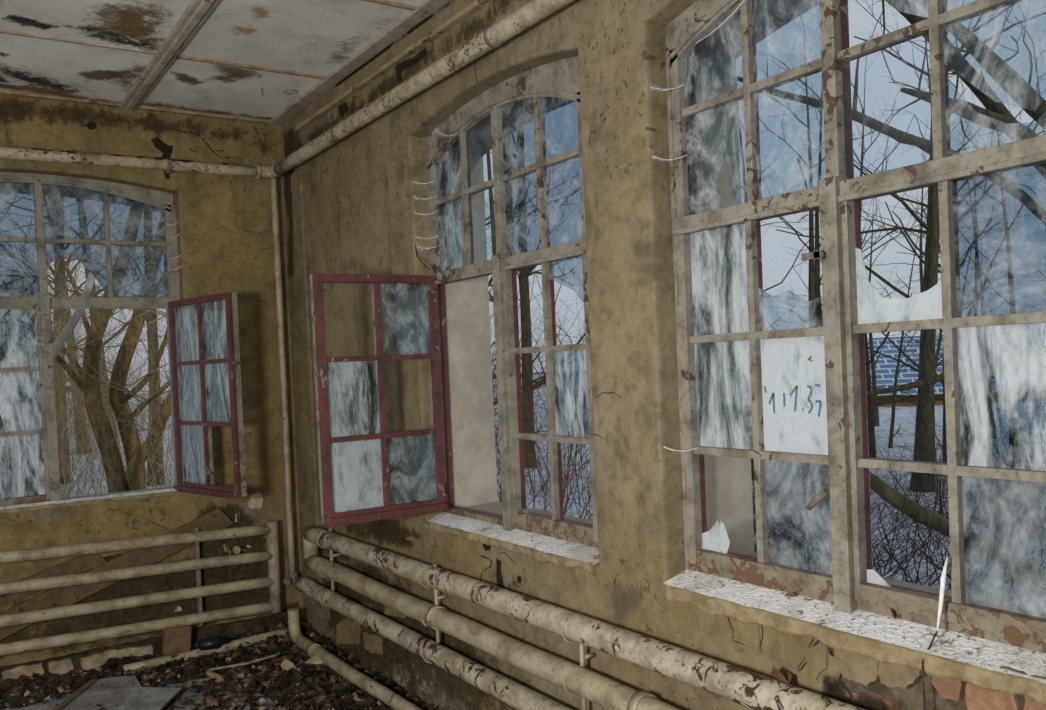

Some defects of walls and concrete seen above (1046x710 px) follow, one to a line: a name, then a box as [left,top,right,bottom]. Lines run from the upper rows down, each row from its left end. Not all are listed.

leakage [4,4,169,50]
leakage [334,2,450,89]
leakage [447,0,509,51]
leakage [0,52,272,179]
leakage [283,46,435,277]
leakage [320,548,417,597]
leakage [345,519,419,548]
crack [480,552,518,580]
leakage [323,578,529,710]
flaking render [733,619,1046,710]